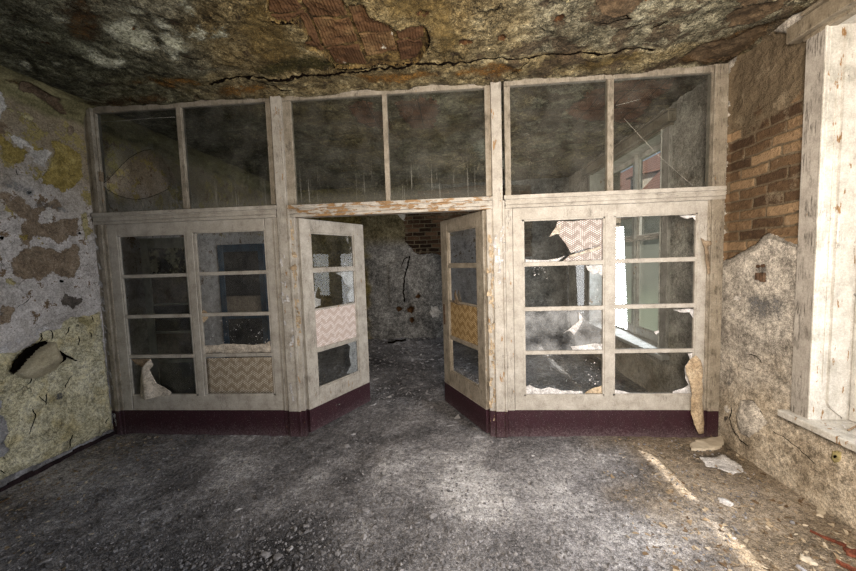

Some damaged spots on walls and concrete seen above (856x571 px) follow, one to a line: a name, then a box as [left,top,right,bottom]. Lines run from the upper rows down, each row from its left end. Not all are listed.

spalling [265,0,431,71]
crack [210,12,667,91]
flaking render [684,23,806,266]
peeling [0,134,98,286]
flaking render [418,185,486,199]
flaking render [503,184,532,196]
flaking render [398,211,478,256]
flaking render [524,221,532,257]
peeling [701,238,712,274]
peeling [0,305,15,325]
peeling [61,293,83,309]
crack [401,256,410,302]